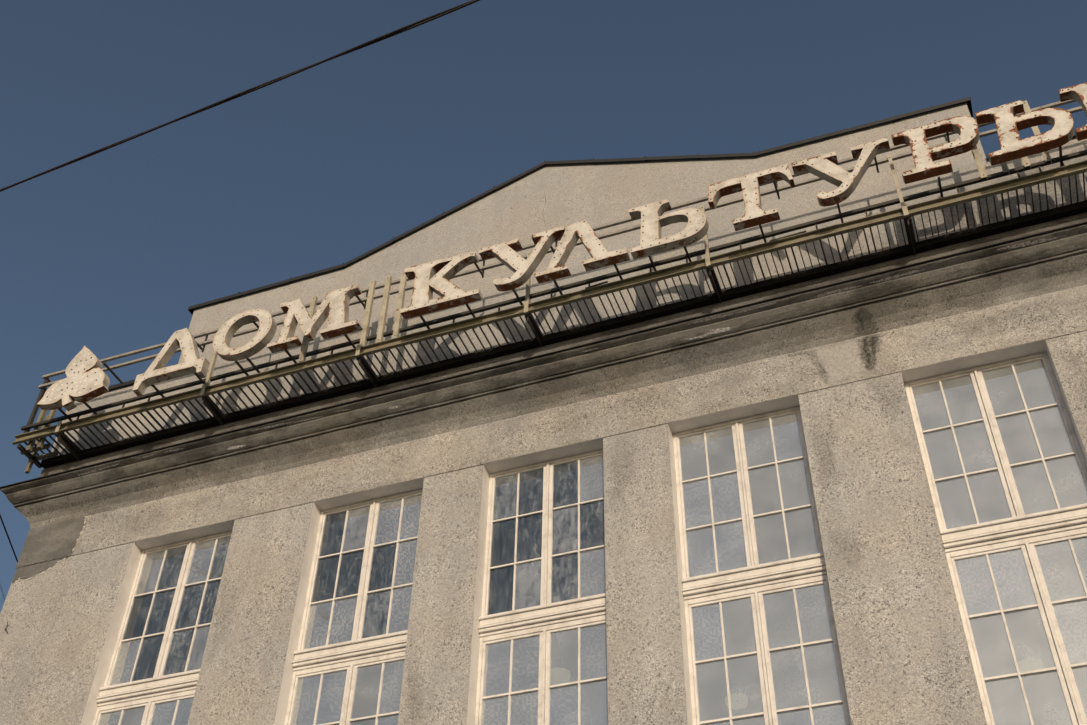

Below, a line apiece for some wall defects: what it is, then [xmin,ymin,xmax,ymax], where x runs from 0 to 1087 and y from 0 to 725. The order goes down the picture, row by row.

water stain [854,307,879,368]